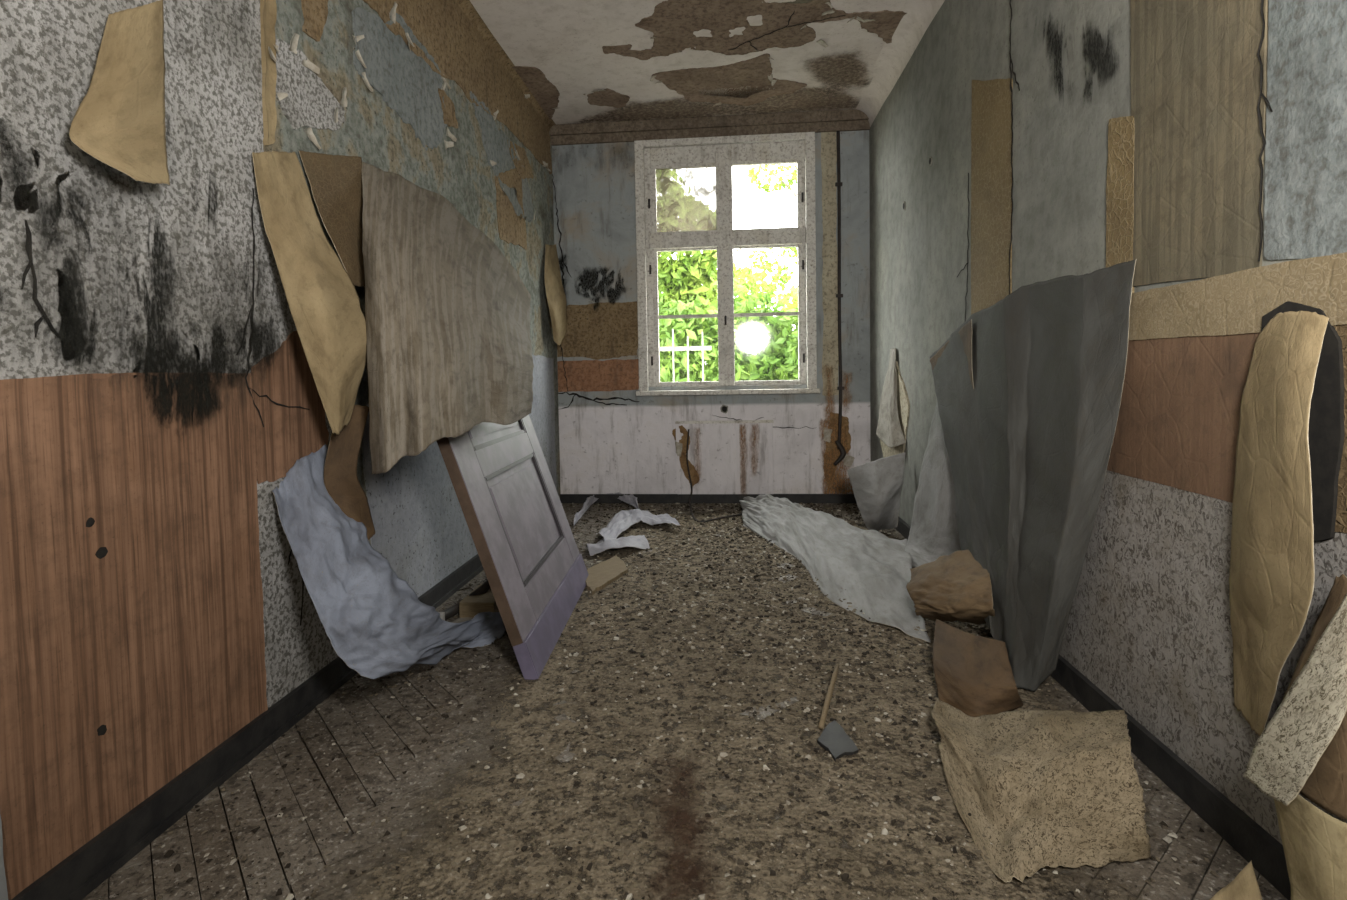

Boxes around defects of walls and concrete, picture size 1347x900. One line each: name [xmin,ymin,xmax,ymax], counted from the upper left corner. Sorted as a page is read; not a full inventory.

peeling [583,88,630,108]
peeling [602,0,907,106]
water stain [0,121,26,187]
water stain [194,176,218,223]
water stain [40,192,95,364]
water stain [126,222,276,425]
corrosion [739,425,756,493]
corrosion [821,368,854,494]